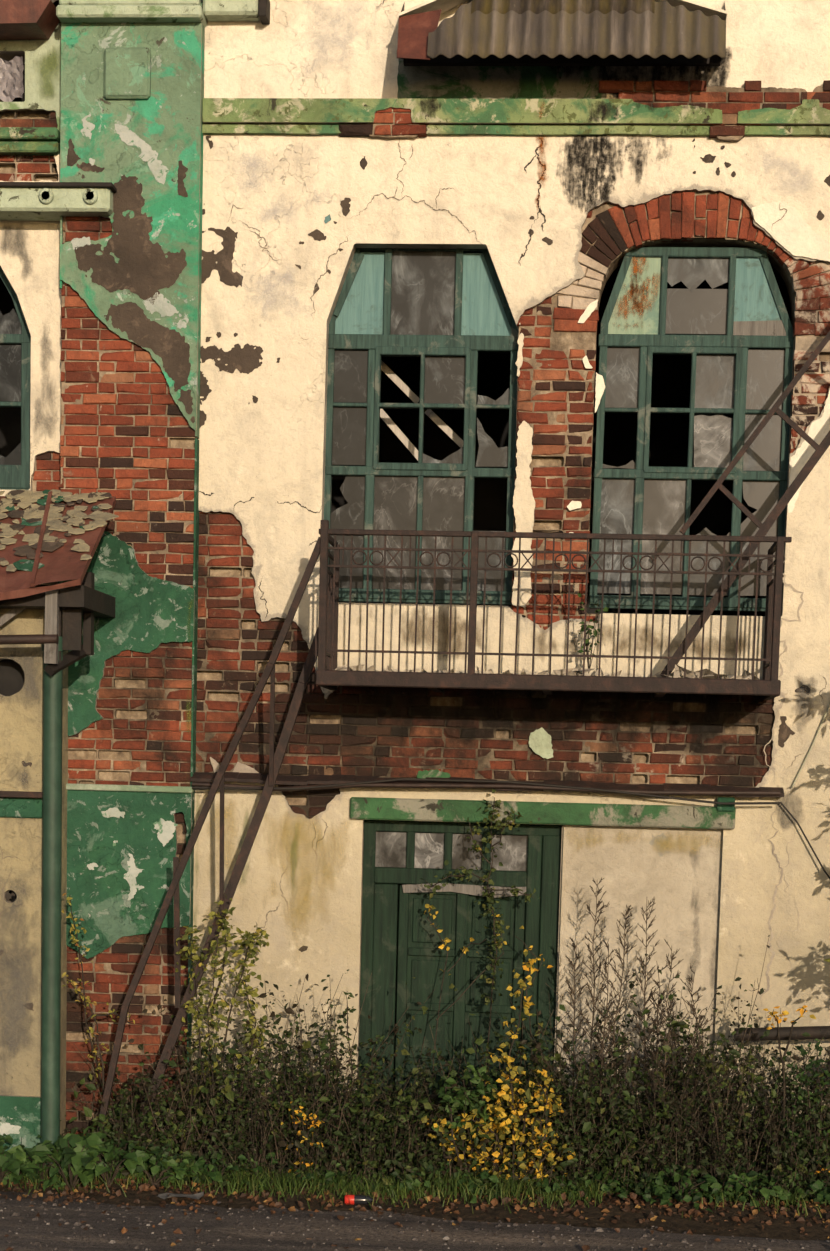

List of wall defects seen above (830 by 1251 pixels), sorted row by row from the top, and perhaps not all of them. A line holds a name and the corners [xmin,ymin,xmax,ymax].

flaking render [0,114,105,182]
crack [227,204,276,261]
spalling [339,108,429,140]
crack [310,140,484,310]
water stain [420,99,441,115]
crack [519,136,546,265]
water stain [557,136,645,209]
water stain [551,48,732,121]
spalling [599,80,830,177]
flaking render [32,124,830,819]
peeling [153,818,178,847]
peeling [113,840,144,900]